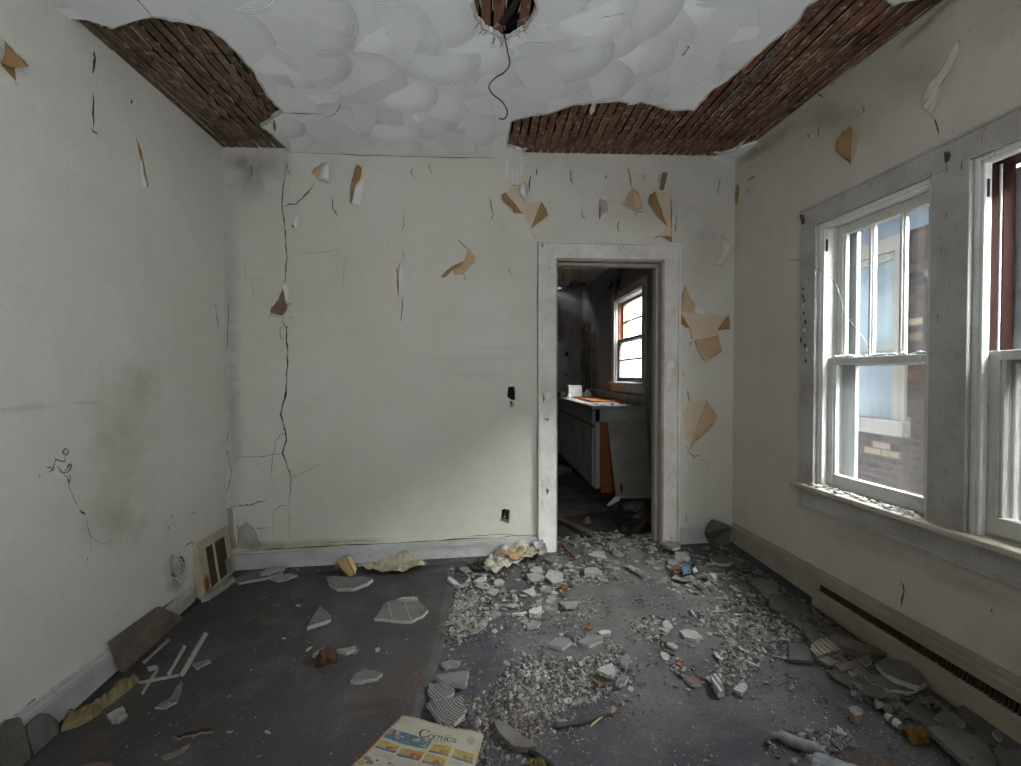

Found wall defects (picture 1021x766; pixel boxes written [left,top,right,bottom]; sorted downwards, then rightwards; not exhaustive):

spalling [471,0,539,41]
peeling [0,41,28,85]
spalling [506,0,818,155]
peeling [836,127,858,164]
peeling [349,164,365,208]
peeling [502,182,548,229]
peeling [620,169,672,242]
peeling [441,240,475,280]
peeling [681,286,730,360]
crack [226,316,538,551]
peeling [684,389,717,459]
crack [66,482,113,552]